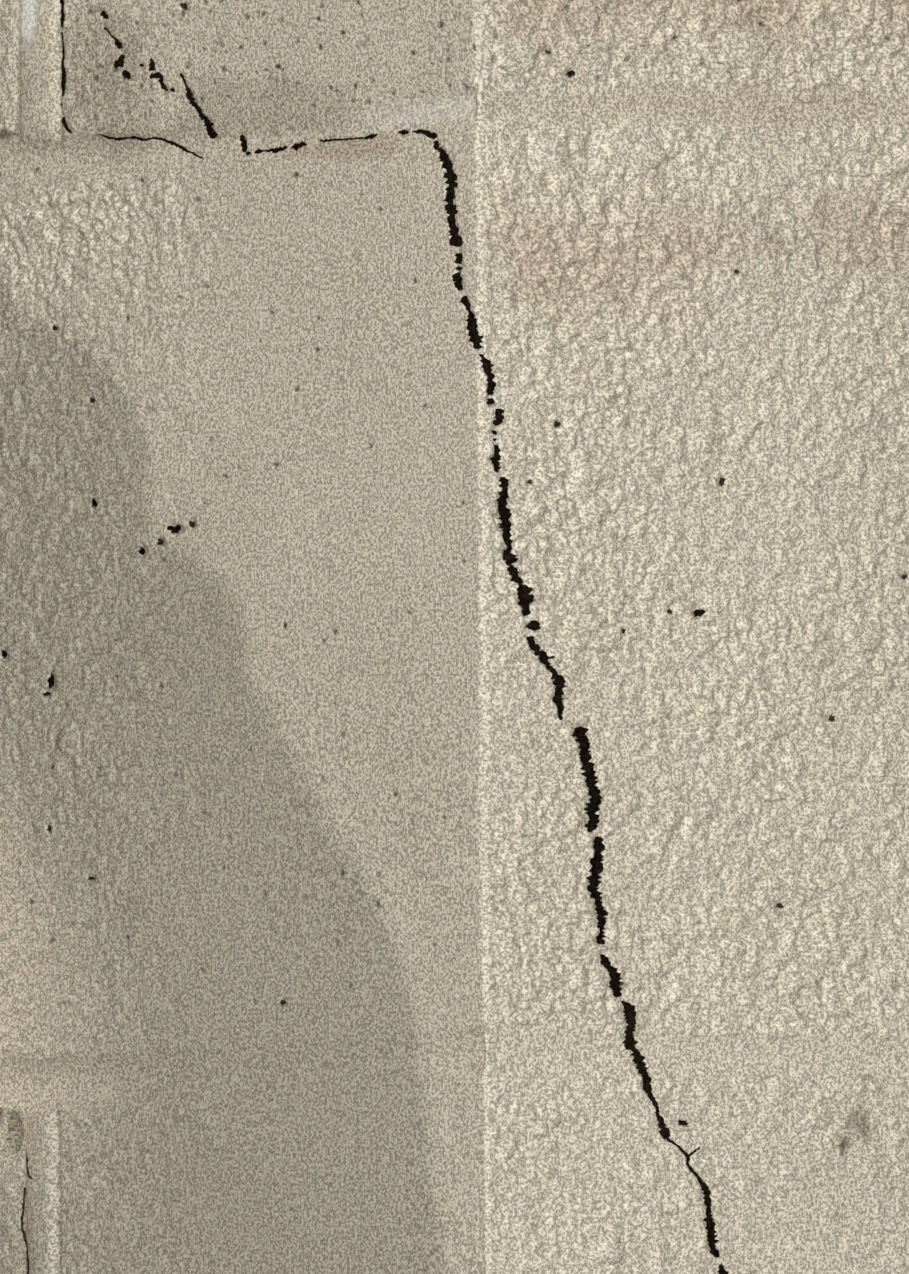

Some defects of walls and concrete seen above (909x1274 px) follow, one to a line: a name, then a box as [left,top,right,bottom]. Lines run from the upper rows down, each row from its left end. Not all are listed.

crack [60,0,729,1274]